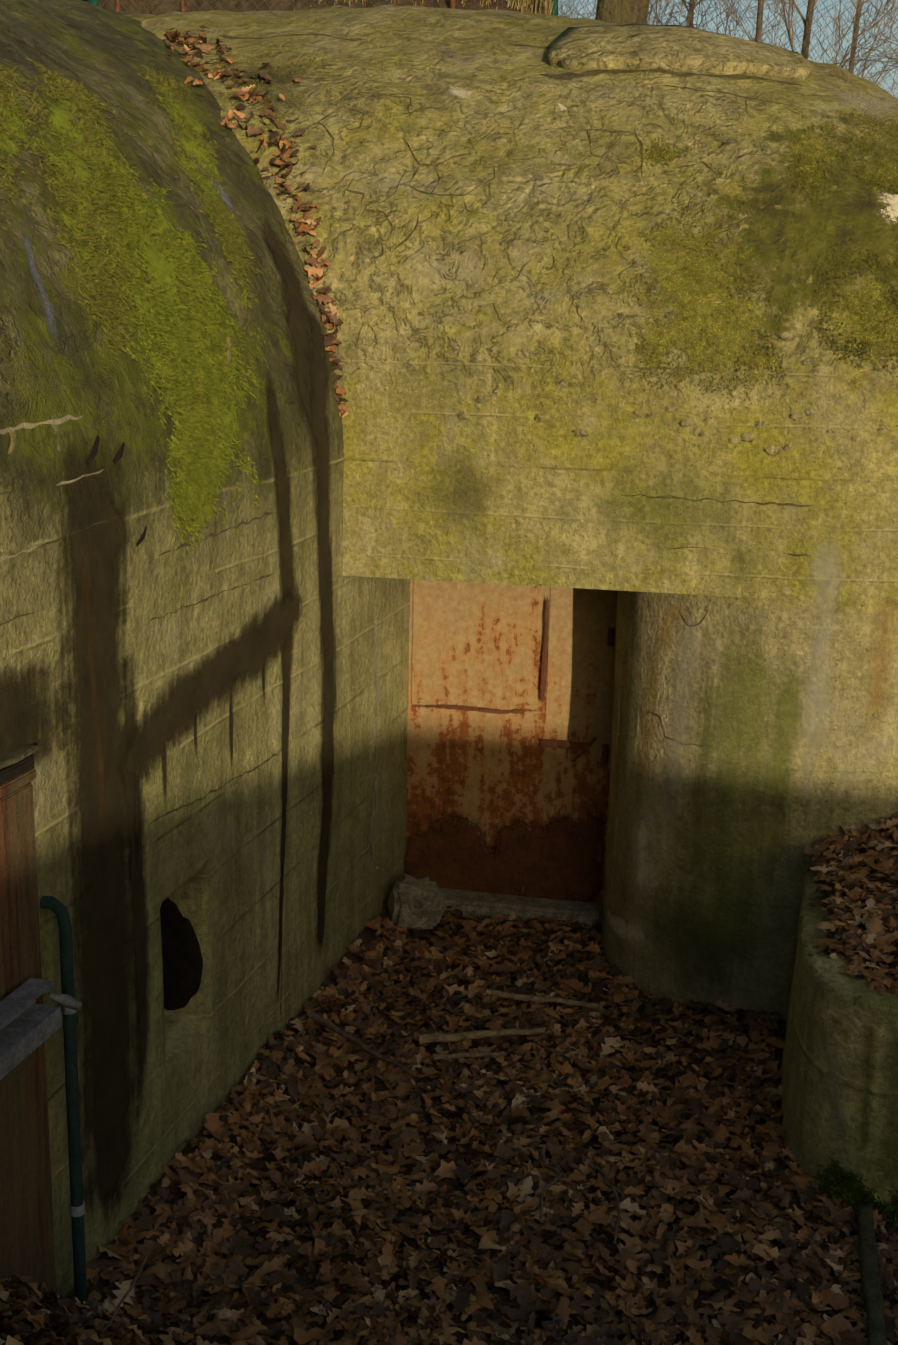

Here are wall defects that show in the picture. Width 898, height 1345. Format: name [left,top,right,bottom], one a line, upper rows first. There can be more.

corrosion [415,596,549,714]
corrosion [404,812,604,902]